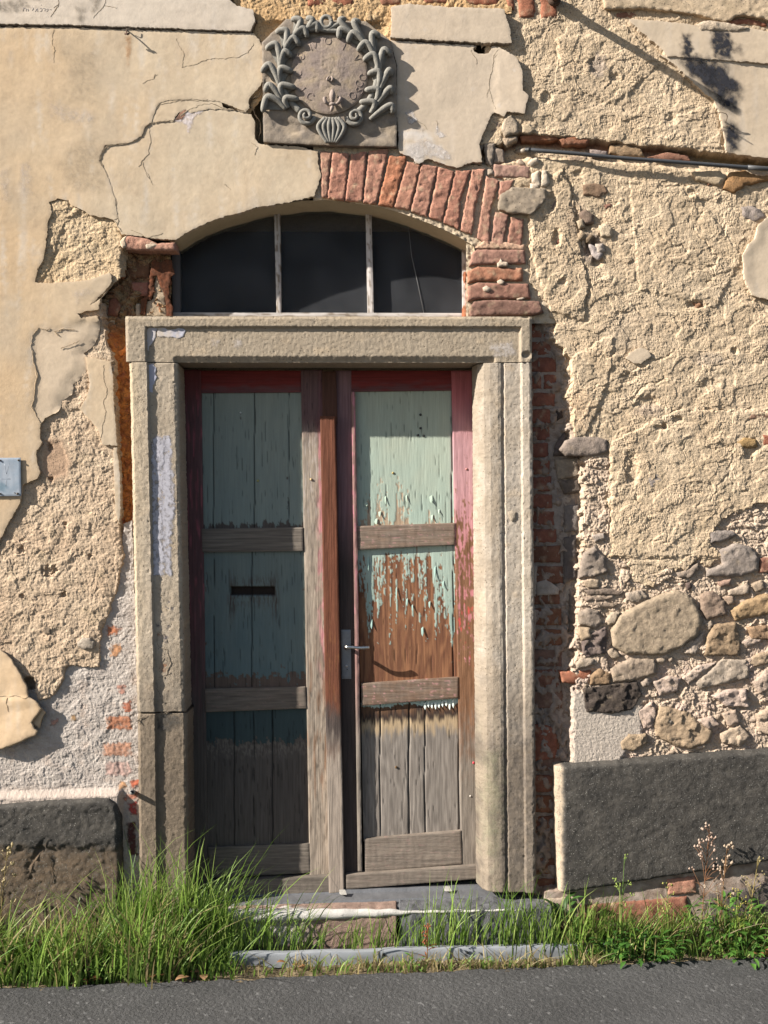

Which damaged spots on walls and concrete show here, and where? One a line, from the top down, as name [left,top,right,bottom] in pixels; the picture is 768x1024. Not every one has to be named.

crack [100,86,262,179]
crack [115,200,161,238]
crack [30,328,77,422]
spalling [234,0,768,895]
spalling [0,199,185,905]